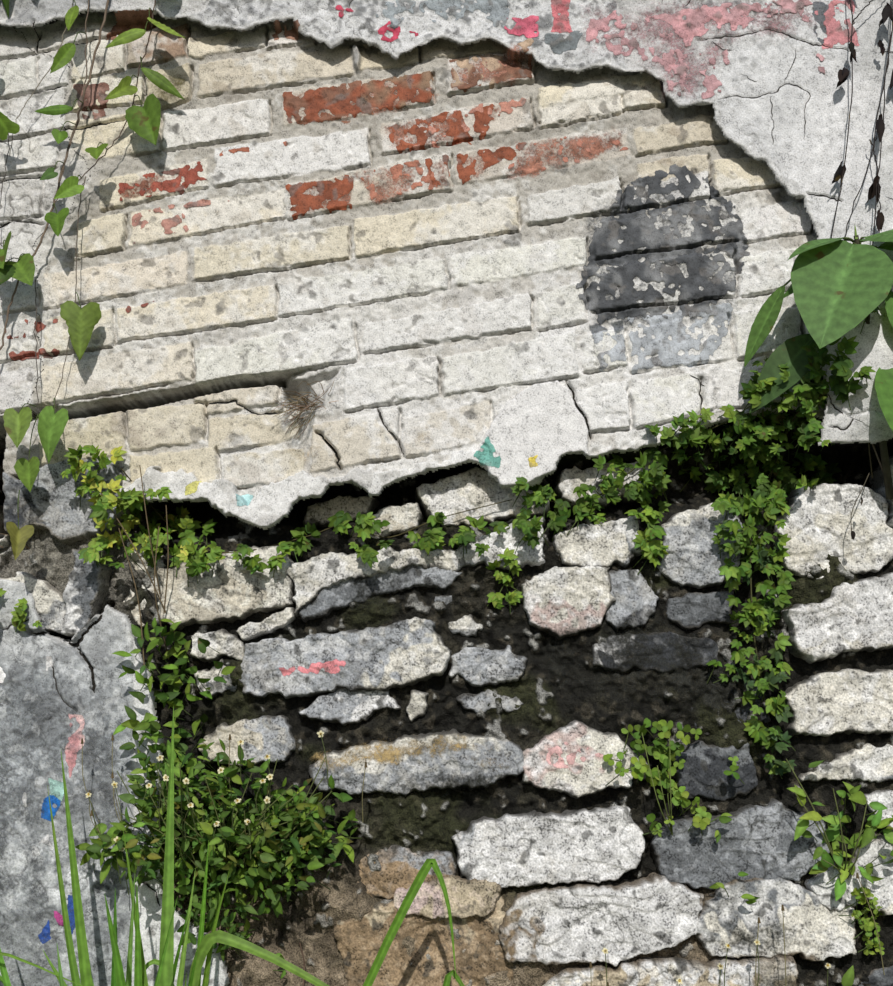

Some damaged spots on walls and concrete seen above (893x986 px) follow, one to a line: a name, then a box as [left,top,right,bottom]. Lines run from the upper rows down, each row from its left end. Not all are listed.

peeling [419,0,539,38]
peeling [544,0,818,99]
crack [700,29,893,143]
flaking render [682,315,719,355]
crack [196,400,282,415]
crack [317,433,341,469]
crack [377,409,404,455]
crack [566,382,591,439]
flaking render [0,529,98,593]
crack [2,605,115,693]
peeling [298,659,346,674]
flaking render [217,943,315,986]